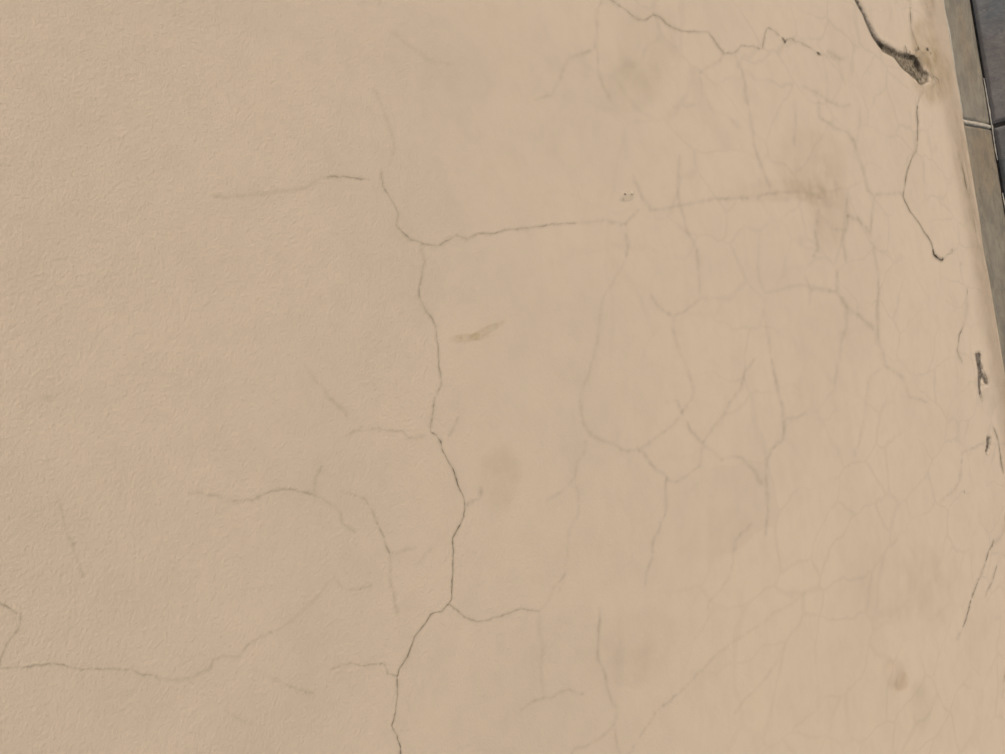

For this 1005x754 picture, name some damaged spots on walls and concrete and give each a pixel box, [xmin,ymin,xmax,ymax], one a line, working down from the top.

flaking render [855,0,937,84]
peeling [973,353,987,394]